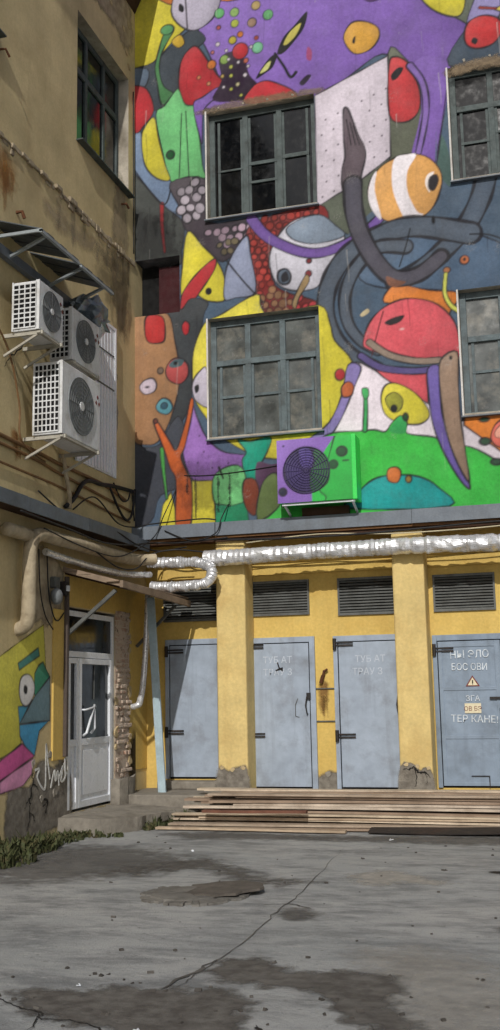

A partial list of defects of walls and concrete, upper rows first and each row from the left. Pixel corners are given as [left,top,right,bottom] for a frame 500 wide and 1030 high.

corrosion [320,682,328,713]
spalling [215,766,251,788]
spalling [398,762,436,790]
water stain [5,957,414,1030]